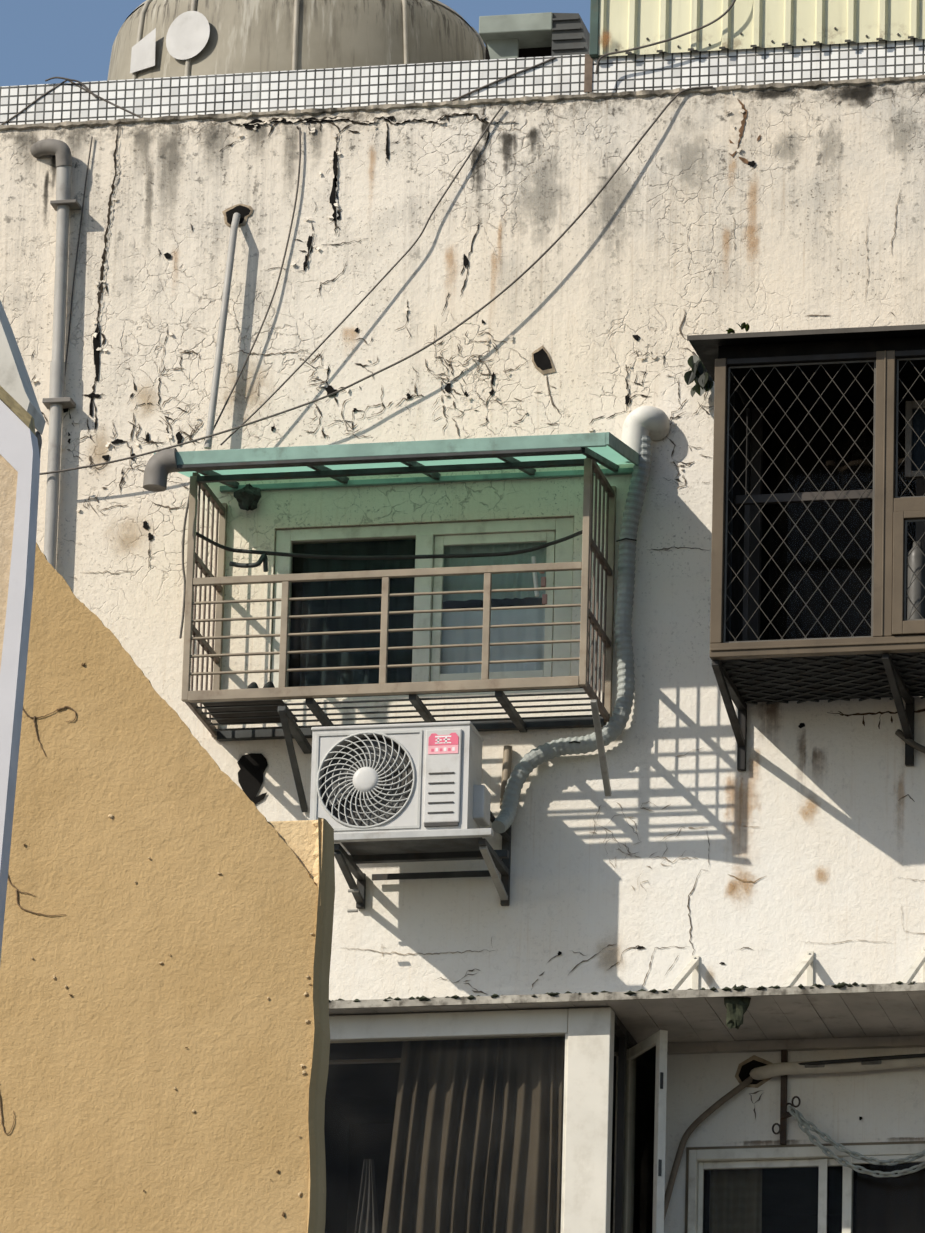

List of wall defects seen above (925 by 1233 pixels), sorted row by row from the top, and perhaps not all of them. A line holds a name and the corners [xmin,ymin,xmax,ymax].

water stain [757,89,791,98]
water stain [838,85,886,105]
crack [219,105,513,295]
crack [41,126,205,579]
crack [235,221,559,440]
crack [587,309,713,489]
crack [531,801,765,990]